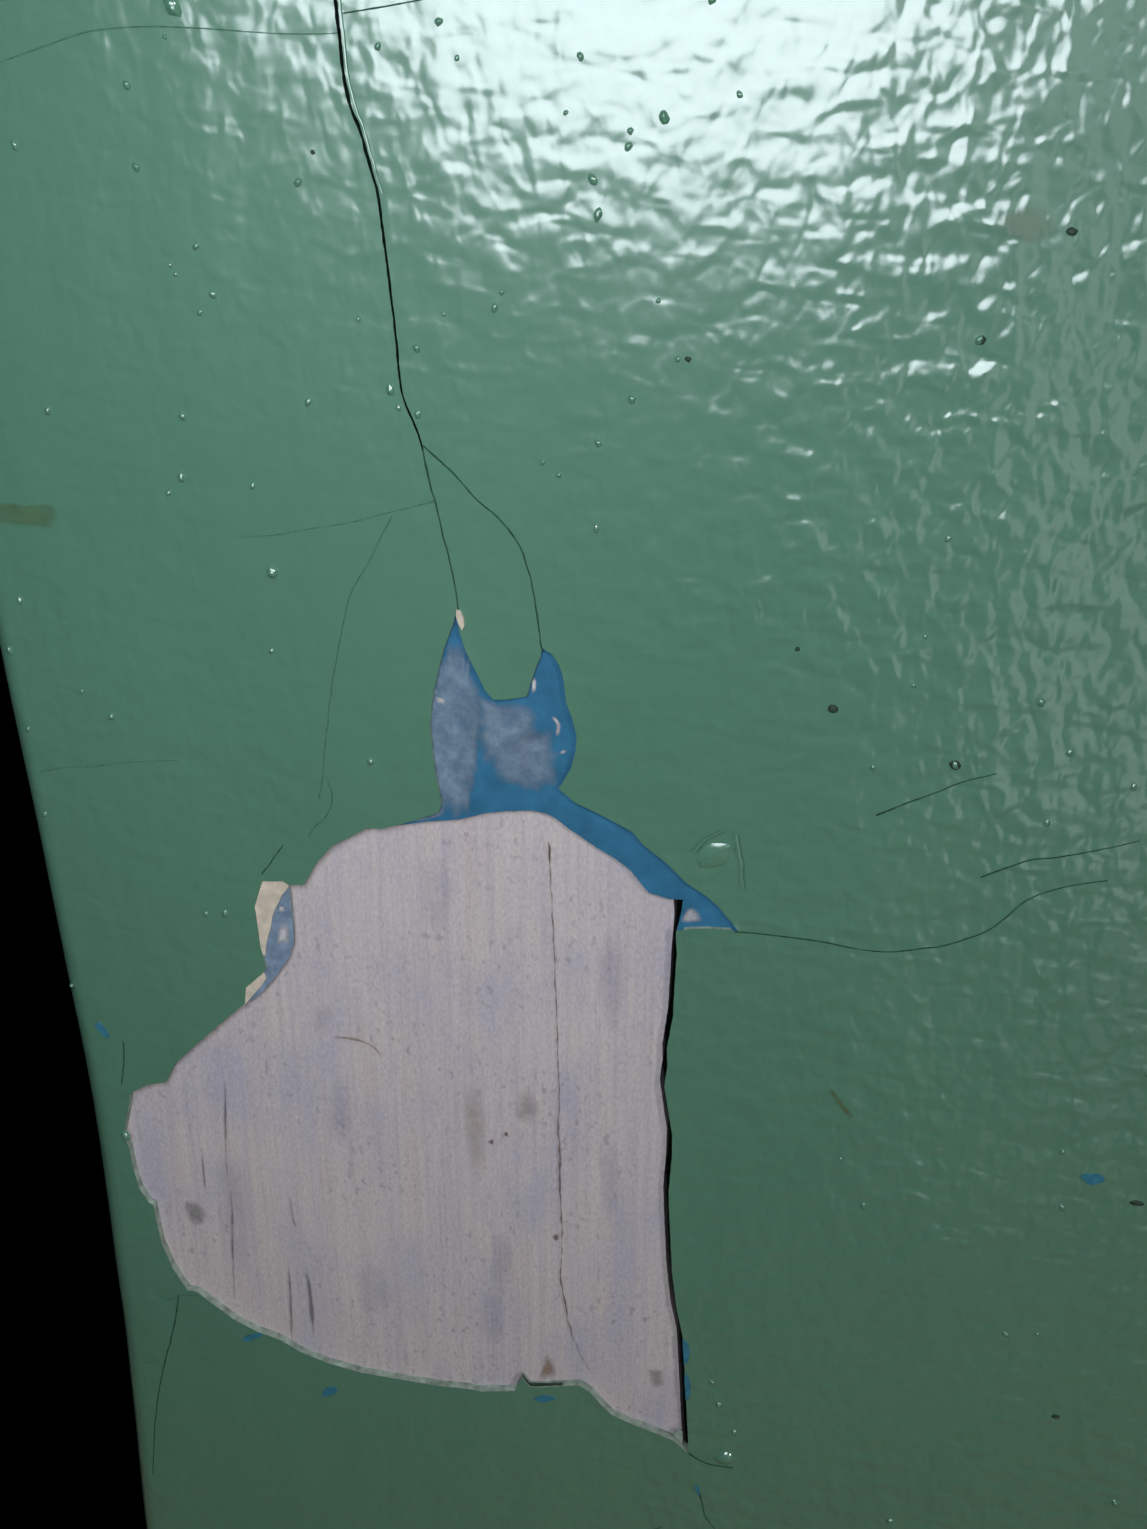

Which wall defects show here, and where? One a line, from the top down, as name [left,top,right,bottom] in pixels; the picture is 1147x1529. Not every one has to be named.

crack [0,0,542,874]
crack [876,773,997,816]
crack [735,840,1140,952]
peeling [127,610,738,1446]
crack [688,1453,733,1529]